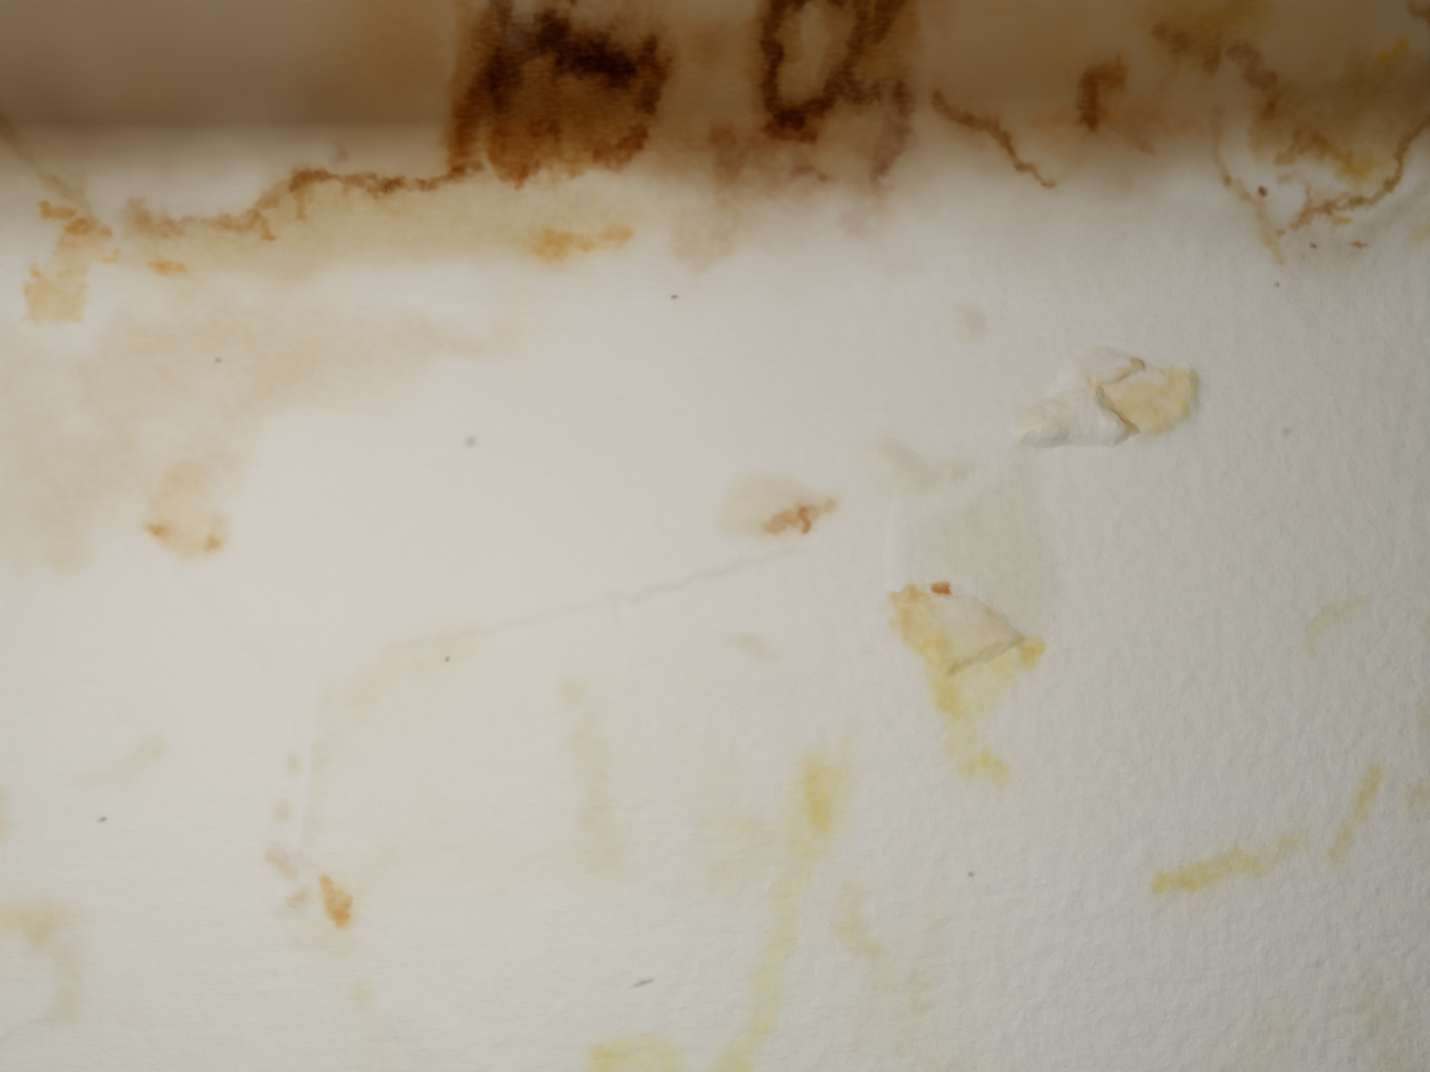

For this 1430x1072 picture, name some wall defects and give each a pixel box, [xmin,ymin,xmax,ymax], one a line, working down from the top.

peeling [1008,343,1211,452]
peeling [914,595,1026,677]